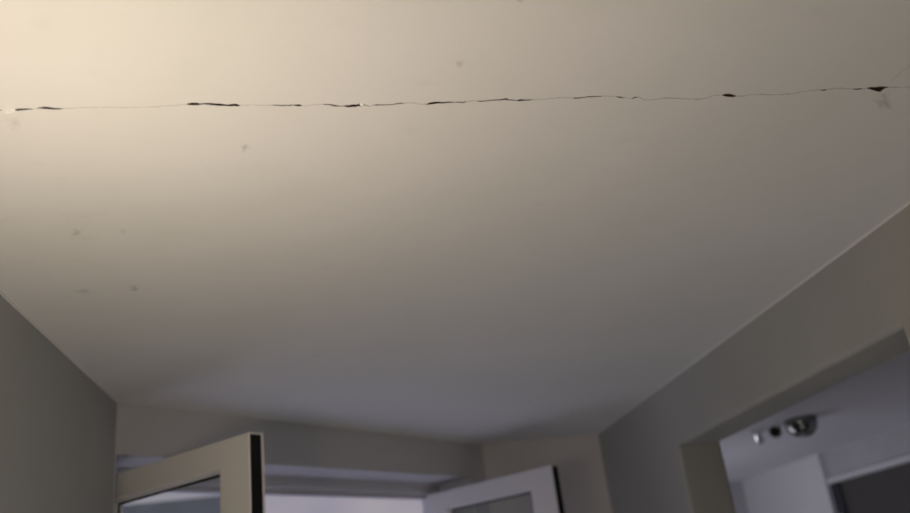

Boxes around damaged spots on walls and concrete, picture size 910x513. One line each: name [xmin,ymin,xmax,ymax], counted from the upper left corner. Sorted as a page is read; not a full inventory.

crack [3,65,910,113]